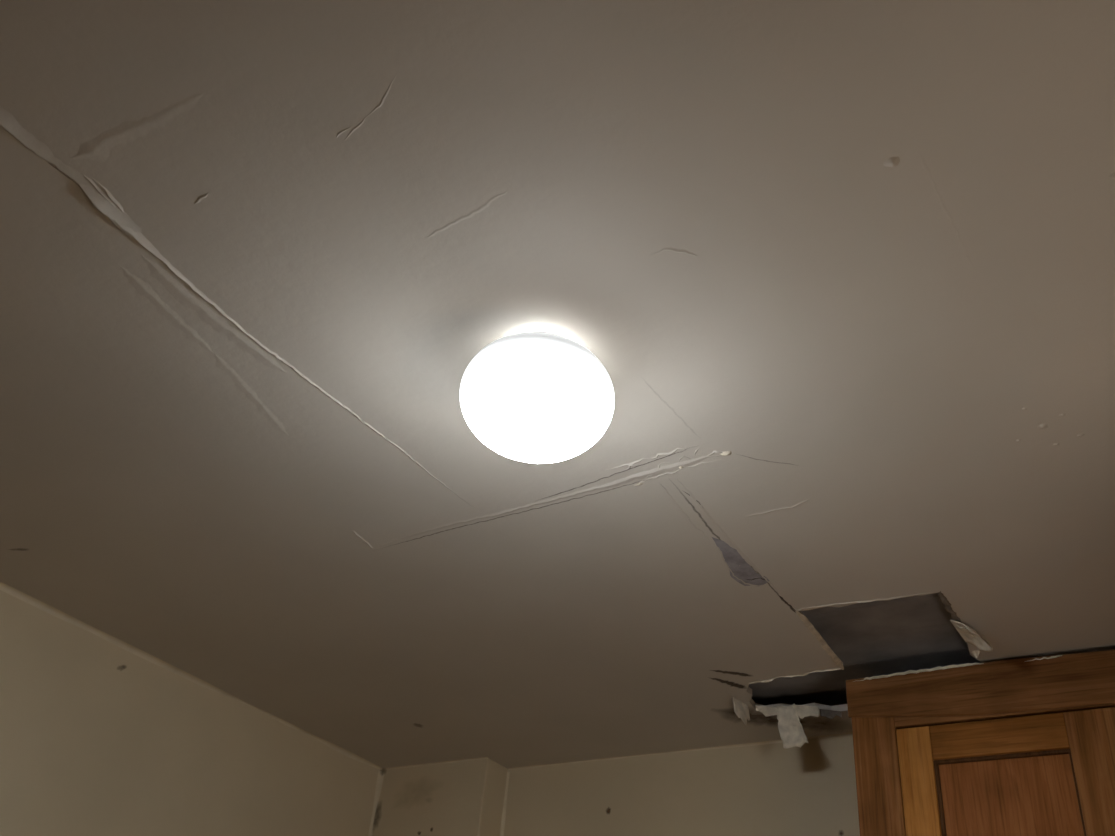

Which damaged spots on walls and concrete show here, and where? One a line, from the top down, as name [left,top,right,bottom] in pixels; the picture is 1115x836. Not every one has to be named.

crack [0,107,675,539]
spalling [748,593,981,706]